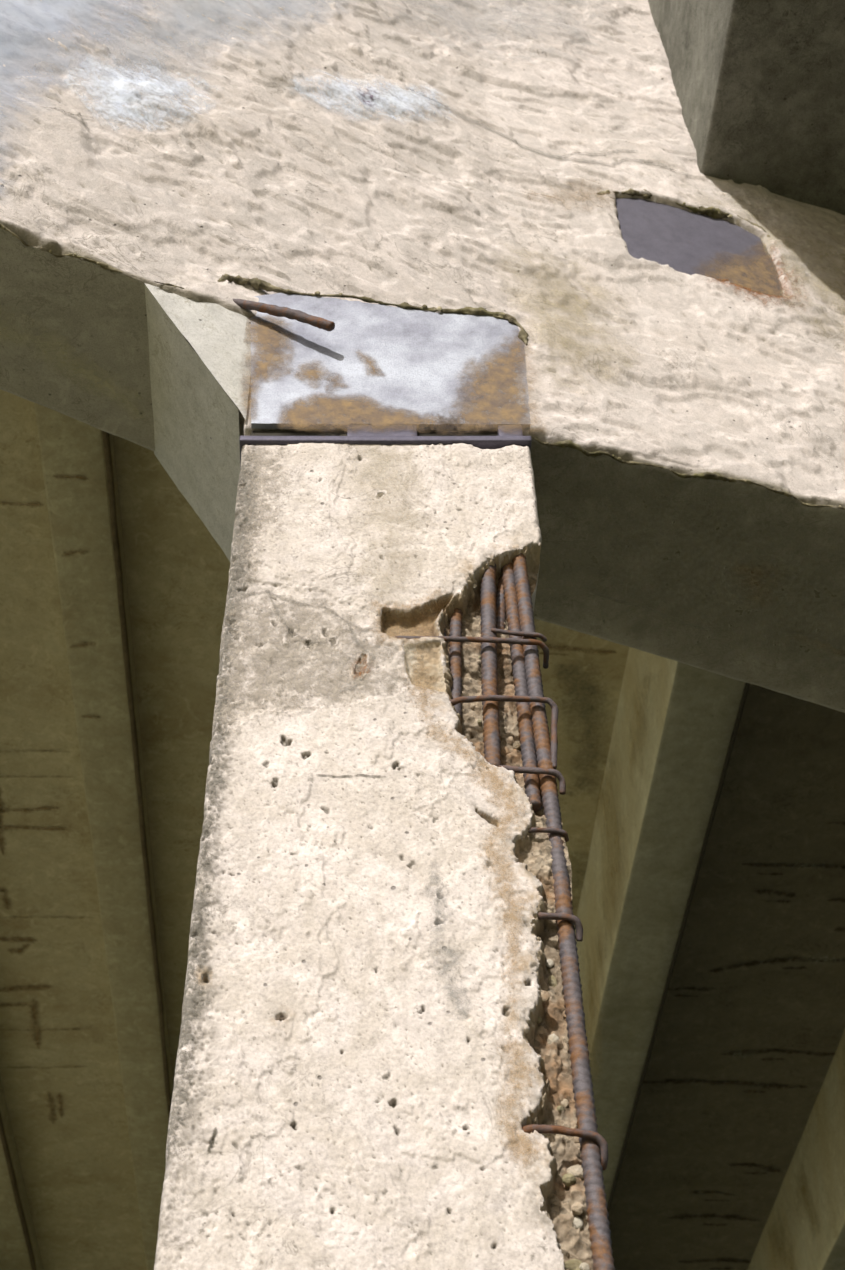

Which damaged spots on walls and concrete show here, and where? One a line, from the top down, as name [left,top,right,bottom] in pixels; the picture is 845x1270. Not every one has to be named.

crack [411,89,682,173]
spalling [597,188,652,199]
spalling [675,202,770,237]
rust [242,317,292,410]
rust [281,341,536,431]
spalling [381,543,615,1270]
rust [473,763,524,965]